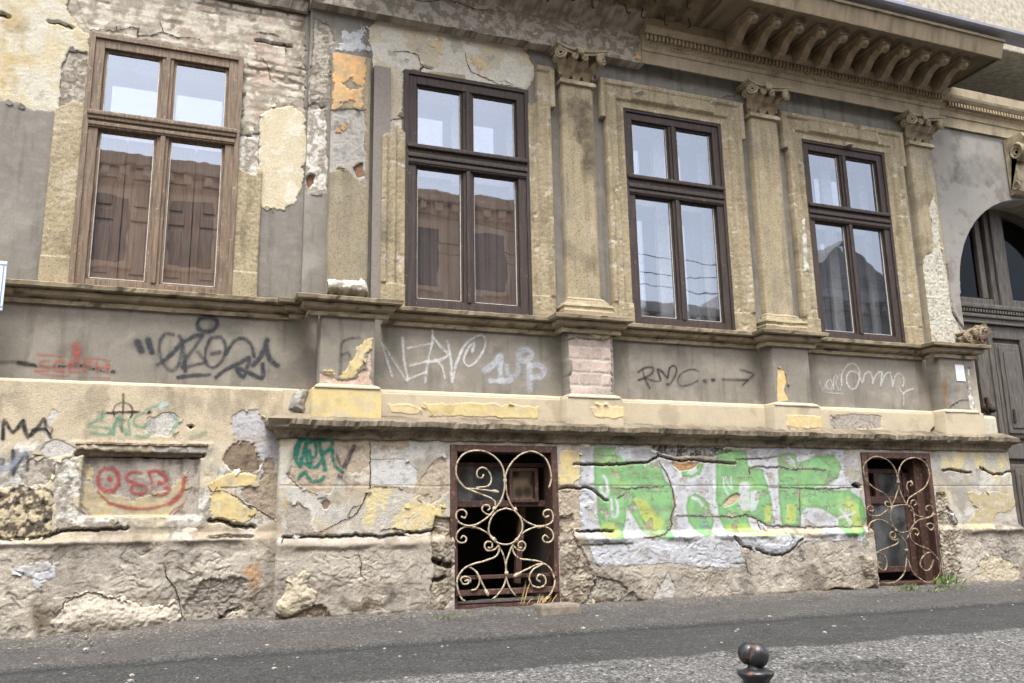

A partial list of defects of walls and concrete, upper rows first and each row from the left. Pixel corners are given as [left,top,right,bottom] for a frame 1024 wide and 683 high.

crack [465,54,520,88]
flaking render [0,0,642,212]
spalling [923,193,960,343]
peeling [387,402,539,420]
spalling [0,409,193,544]
spalling [939,451,1010,473]
spalling [208,407,456,611]
crack [558,452,862,574]
peeling [734,525,823,556]
crack [51,591,131,615]
crack [158,563,205,621]
spalling [654,573,676,599]